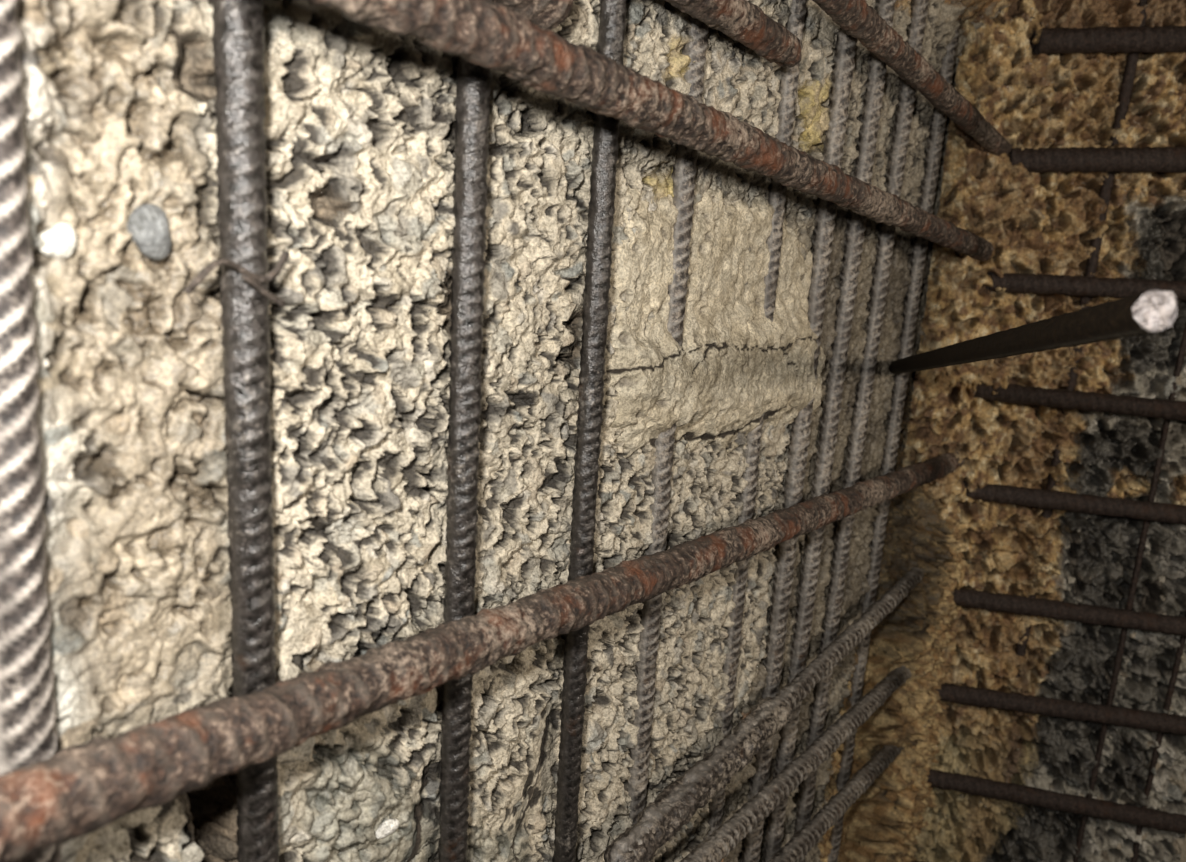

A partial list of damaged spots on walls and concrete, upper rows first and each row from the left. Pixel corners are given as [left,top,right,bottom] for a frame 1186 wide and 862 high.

rust [664,37,694,78]
spalling [171,0,269,275]
rust [798,78,832,151]
rust [642,167,674,200]
rust [917,0,1186,354]
spalling [310,0,1186,582]
crack [606,336,817,376]
spalling [0,55,964,862]
crack [650,406,787,450]
rust [1107,469,1150,499]
rust [1171,475,1186,506]
rust [818,339,1134,862]